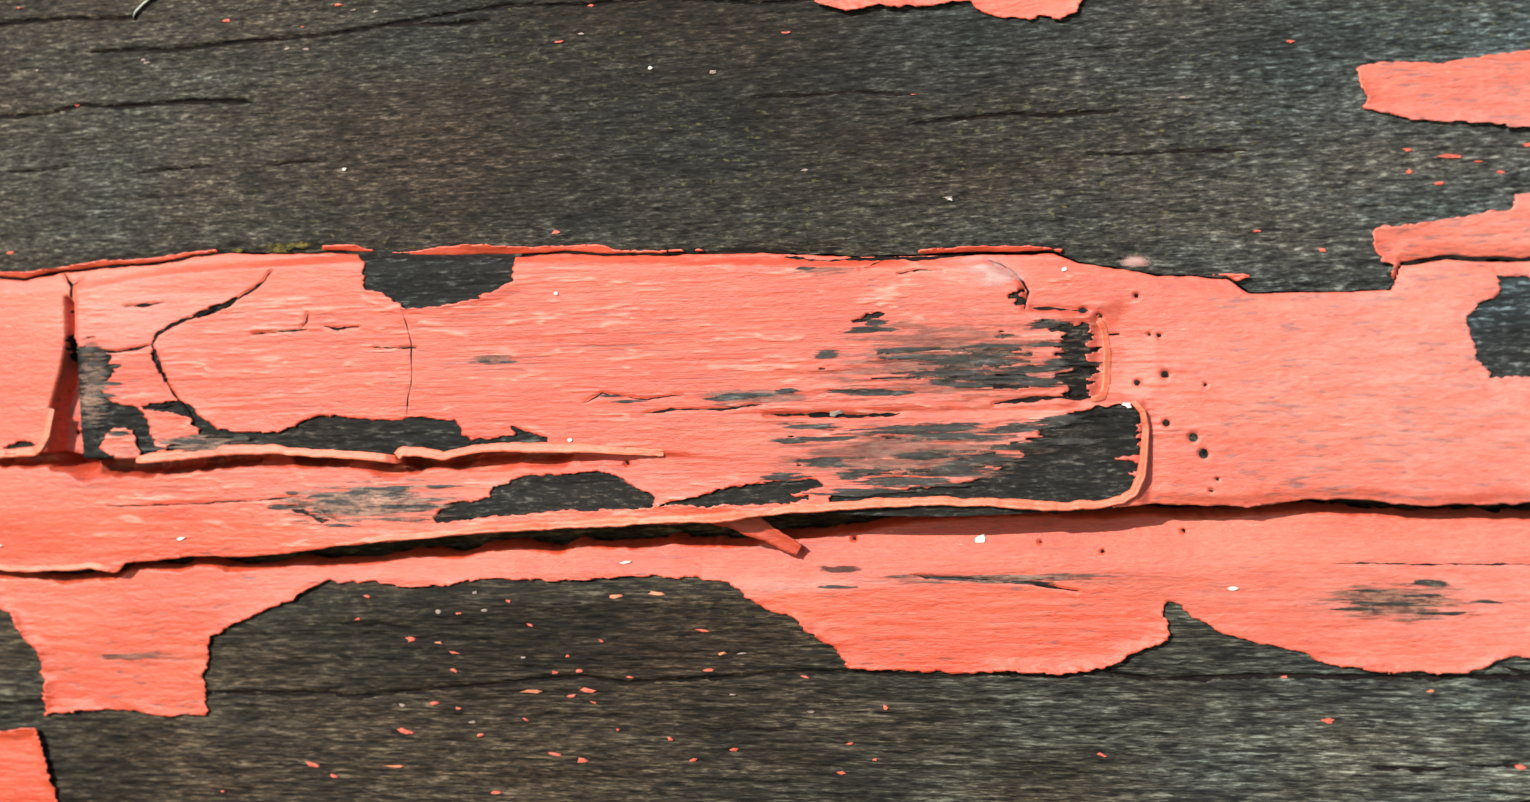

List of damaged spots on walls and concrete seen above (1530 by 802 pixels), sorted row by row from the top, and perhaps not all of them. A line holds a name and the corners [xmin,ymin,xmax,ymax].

crack [0,0,811,53]
crack [0,98,253,119]
peeling [0,0,1530,309]
crack [0,250,232,314]
crack [88,272,271,420]
crack [252,308,416,407]
crack [520,247,1077,311]
peeling [1466,275,1530,378]
peeling [0,408,55,459]
peeling [65,307,1170,555]
peeling [888,572,1105,585]
peeling [0,574,1530,802]